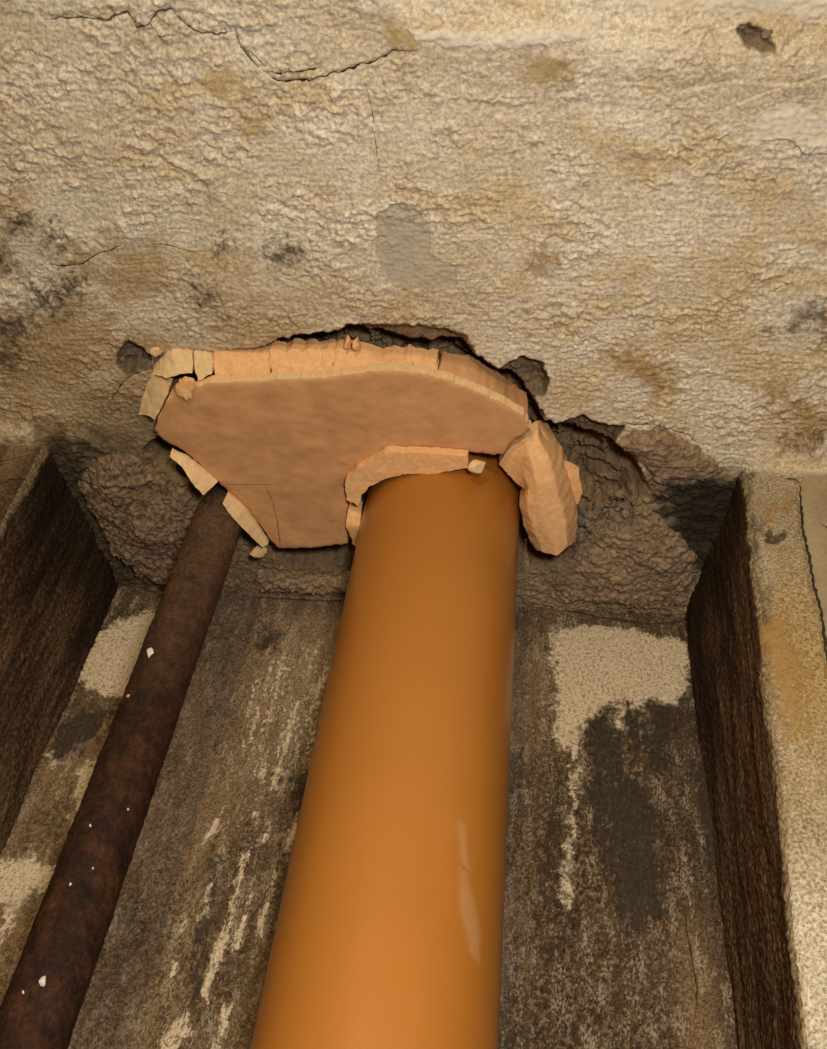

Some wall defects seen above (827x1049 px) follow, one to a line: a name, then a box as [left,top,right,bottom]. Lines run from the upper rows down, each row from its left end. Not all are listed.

crack [45,8,411,167]
spalling [117,340,163,375]
peeling [344,334,359,351]
spalling [500,355,550,396]
spalling [565,414,625,442]
peeling [468,460,486,474]
peeling [250,545,267,558]
damp [43,608,155,827]
damp [537,624,717,951]